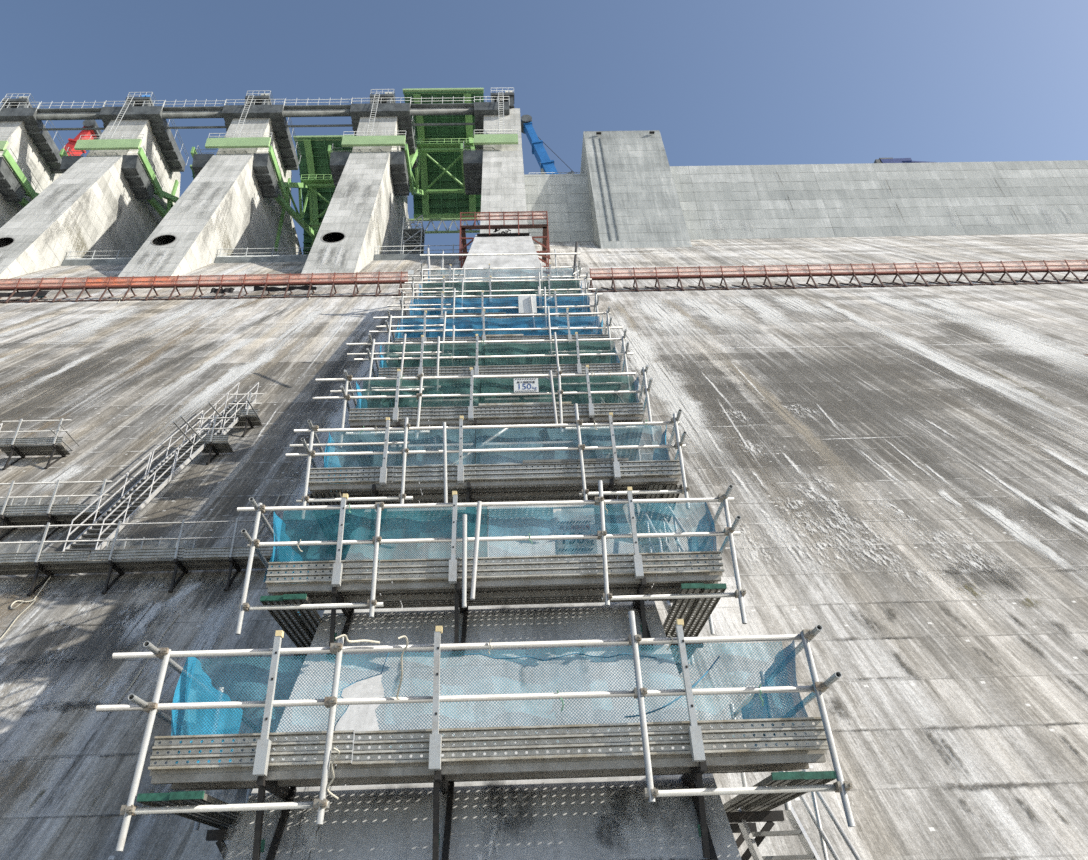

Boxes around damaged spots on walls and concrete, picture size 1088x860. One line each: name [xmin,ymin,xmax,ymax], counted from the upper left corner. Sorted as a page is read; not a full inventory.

damp [35,466,86,489]
damp [0,303,200,431]
damp [124,309,323,463]
damp [604,295,1088,545]
damp [977,502,1078,571]
damp [0,578,238,696]